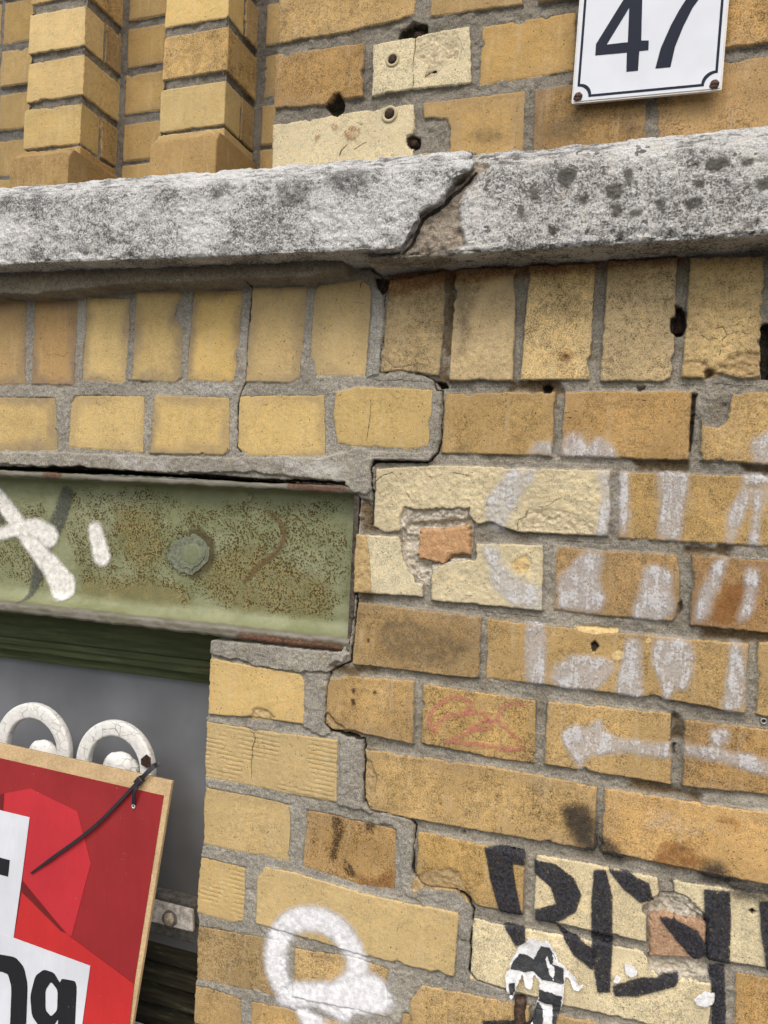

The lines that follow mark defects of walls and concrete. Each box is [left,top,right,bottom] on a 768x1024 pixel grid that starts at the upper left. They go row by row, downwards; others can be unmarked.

crack [403,172,477,254]
crack [367,342,485,517]
rust [0,537,46,587]
rust [14,499,47,520]
crack [11,466,345,486]
rust [65,483,351,620]
spalling [400,508,474,582]
spalling [518,509,594,535]
rust [236,633,342,651]
crack [325,592,418,876]
spalling [613,892,710,983]
peeling [694,991,715,1007]